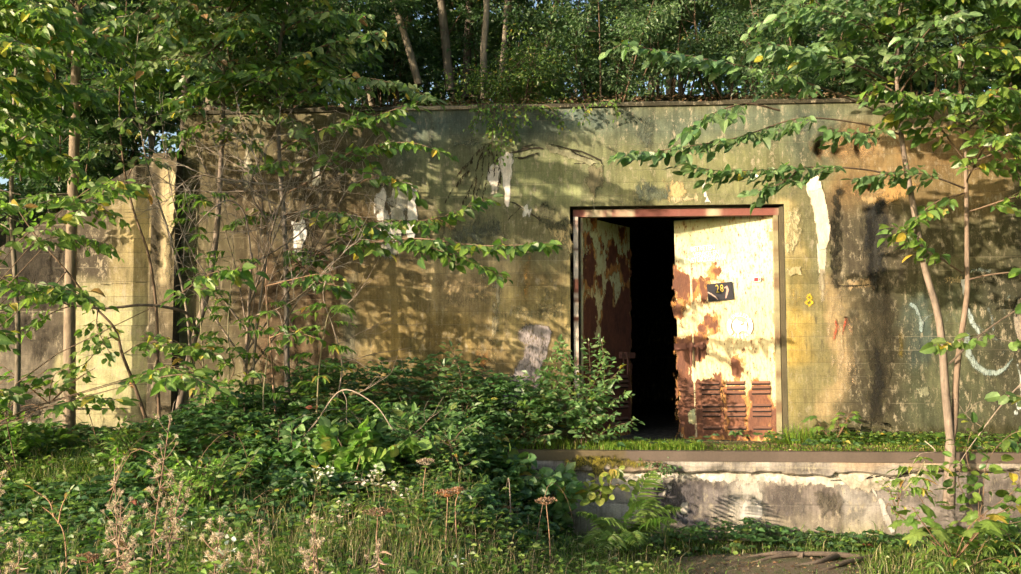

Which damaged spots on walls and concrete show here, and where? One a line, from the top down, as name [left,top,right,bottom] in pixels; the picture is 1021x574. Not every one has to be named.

corrosion [579,218,633,440]
corrosion [671,261,777,441]
damp [806,175,844,302]
damp [860,198,896,423]